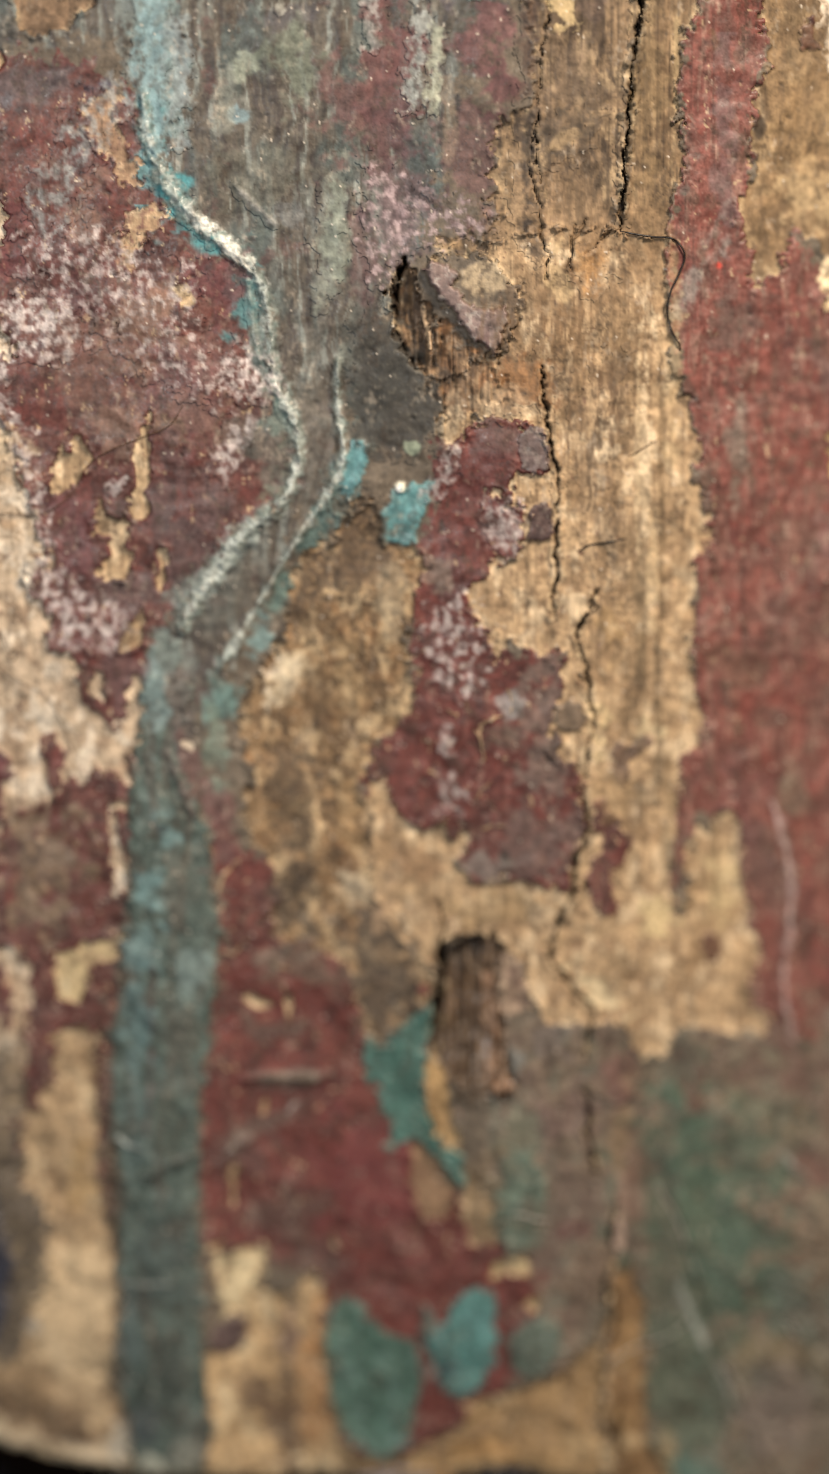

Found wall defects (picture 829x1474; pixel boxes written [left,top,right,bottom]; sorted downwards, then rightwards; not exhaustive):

peeling [0,200,10,247]
peeling [81,113,173,249]
crack [529,0,651,280]
peeling [735,0,829,315]
peeling [0,434,147,898]
peeling [91,410,152,582]
peeling [155,547,169,593]
peeling [238,0,774,1279]
peeling [52,932,128,1004]
crack [497,354,630,1458]
peeling [0,944,134,1469]
peeling [203,1237,668,1474]